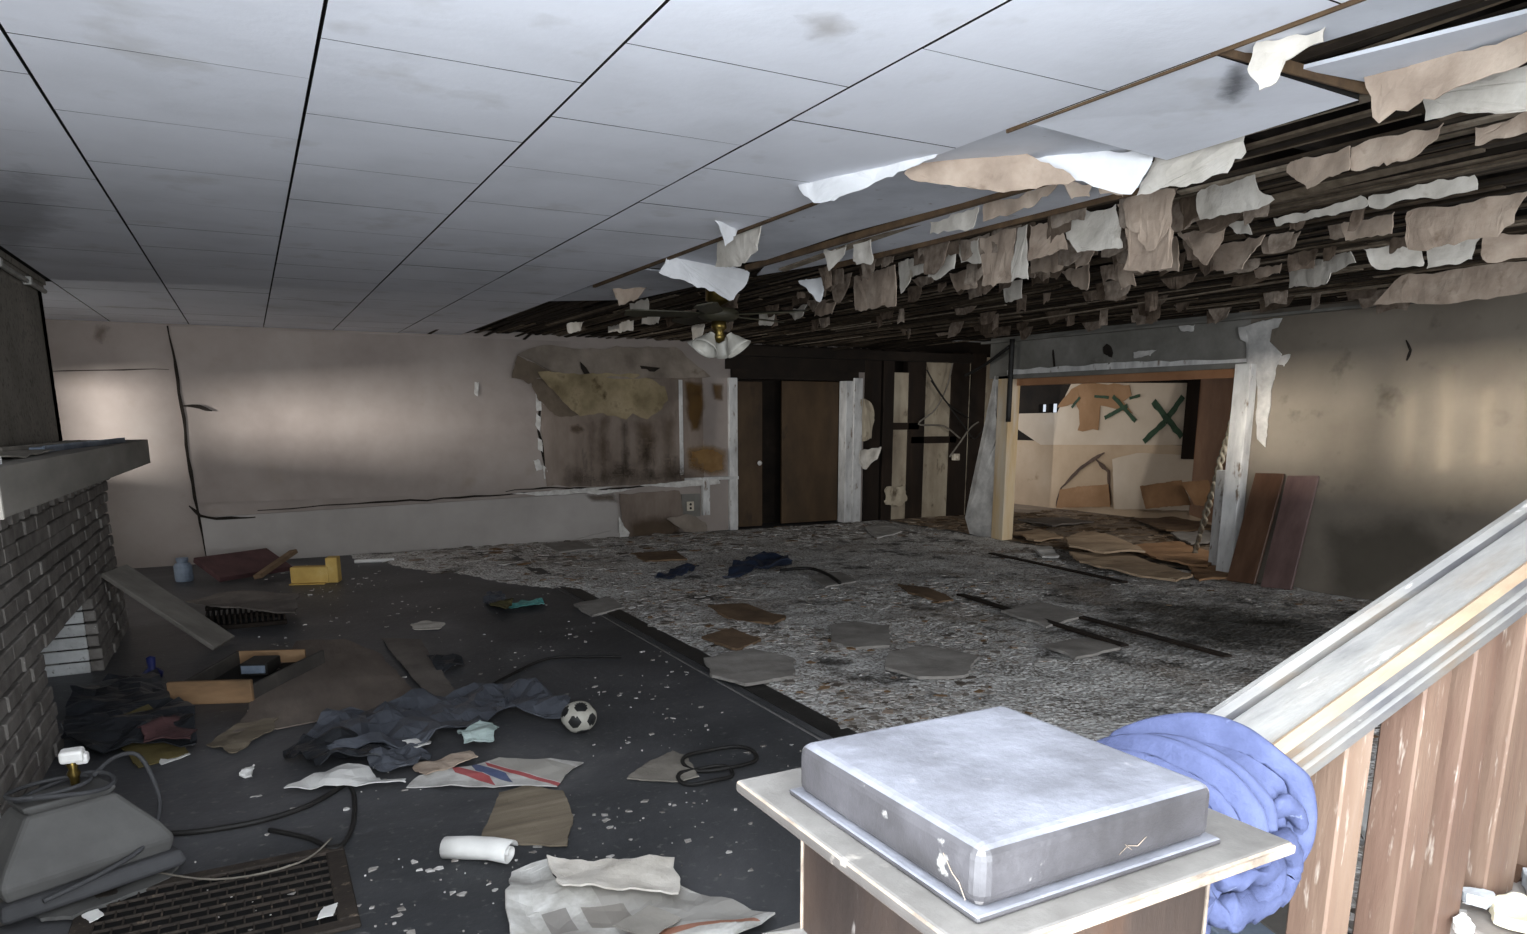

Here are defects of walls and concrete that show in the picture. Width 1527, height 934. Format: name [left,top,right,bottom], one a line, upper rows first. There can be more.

peeling [1247,27,1326,91]
peeling [1286,32,1527,189]
crack [53,326,720,556]
peeling [567,321,584,334]
peeling [608,287,660,333]
flaking render [405,378,924,574]
peeling [692,324,705,340]
peeling [659,220,761,301]
peeling [759,136,1527,326]
spalling [1007,318,1291,447]